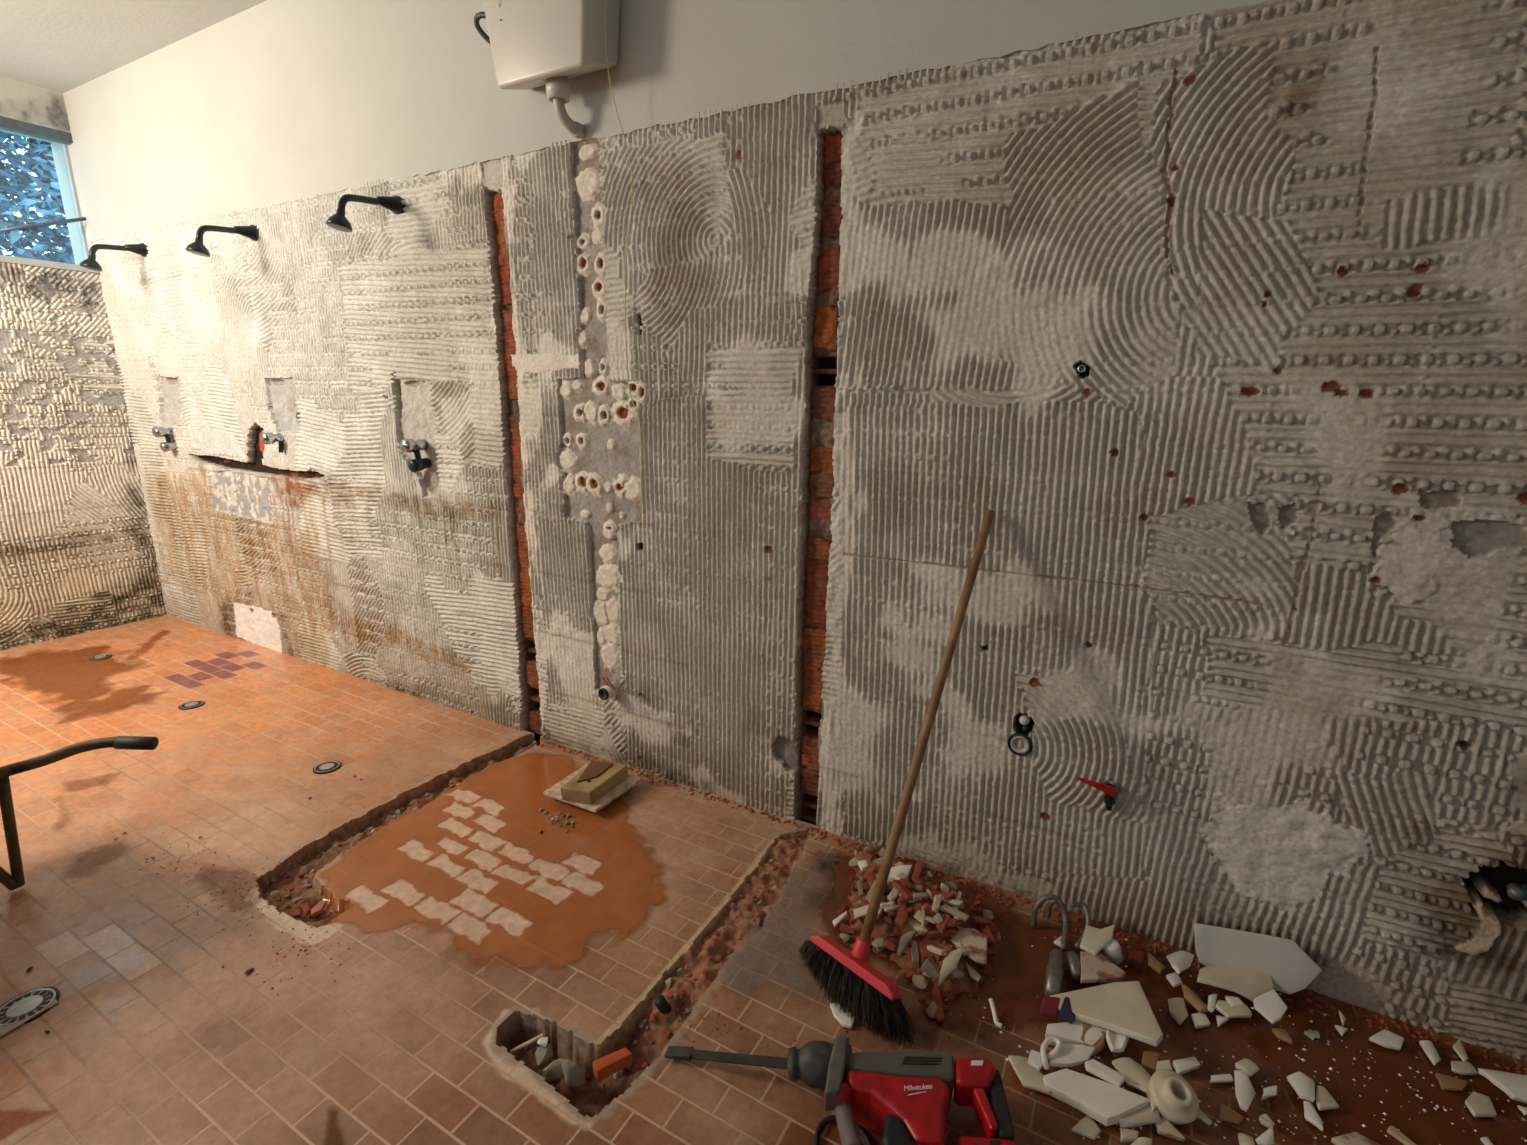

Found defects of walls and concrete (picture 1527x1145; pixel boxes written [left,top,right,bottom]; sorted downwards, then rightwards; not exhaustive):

spalling [1245,501,1300,536]
spalling [1367,483,1527,585]
spalling [1451,860,1527,956]